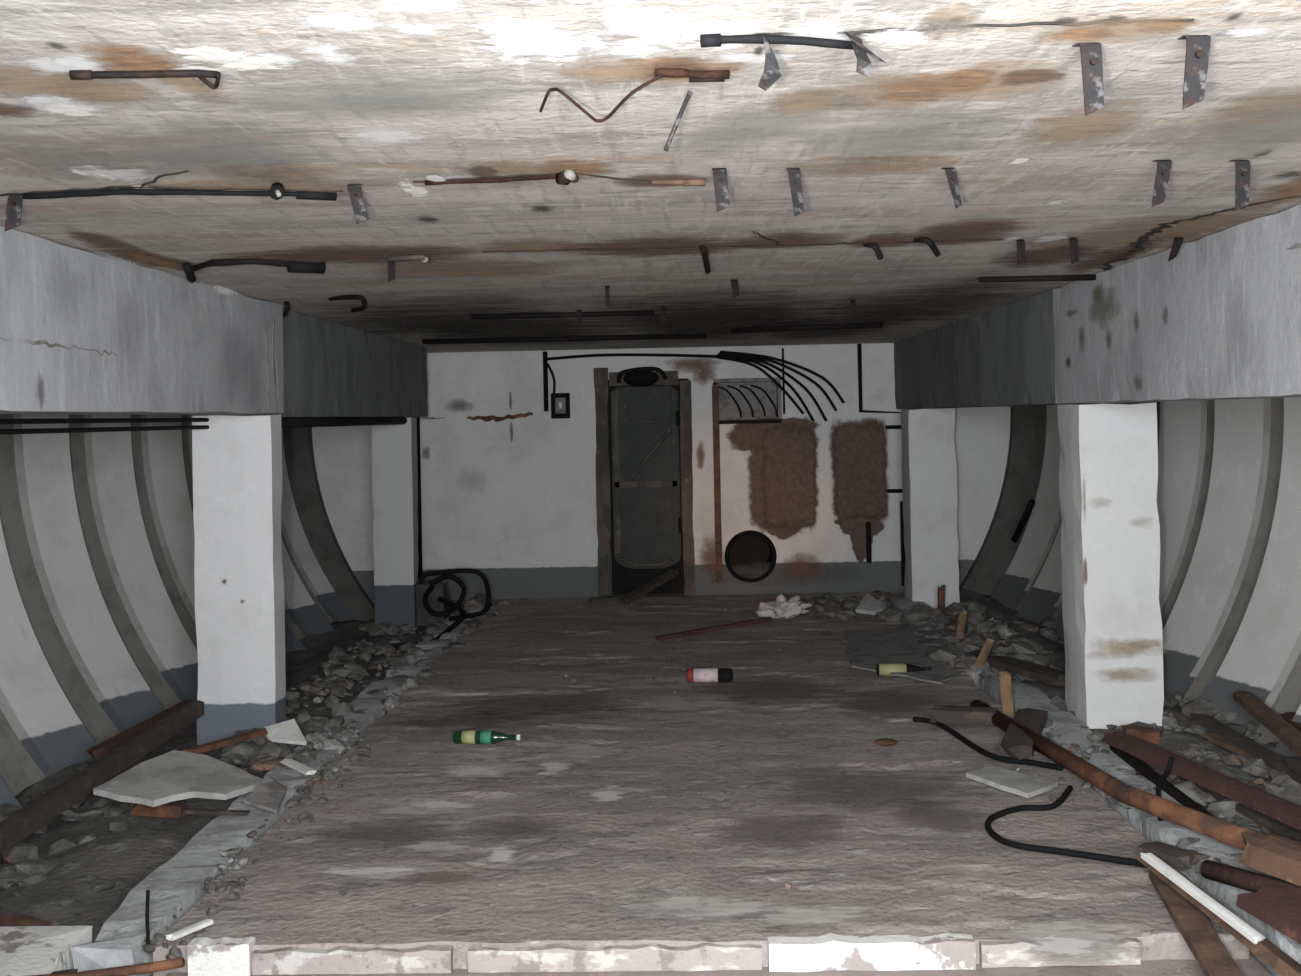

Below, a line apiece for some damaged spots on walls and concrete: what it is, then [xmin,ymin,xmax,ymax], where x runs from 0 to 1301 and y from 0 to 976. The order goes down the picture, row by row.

corrosion [0,47,220,115]
corrosion [572,58,738,80]
corrosion [782,62,1058,111]
peeling [727,418,888,562]